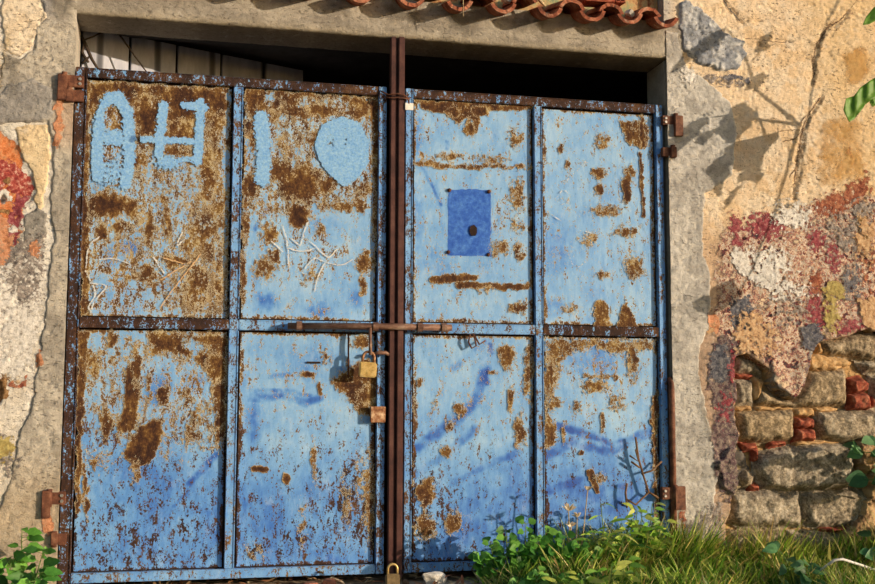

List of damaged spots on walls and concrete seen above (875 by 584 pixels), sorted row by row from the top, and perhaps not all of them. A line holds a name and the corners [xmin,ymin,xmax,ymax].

peeling [0,434,22,478]
peeling [0,124,51,402]
corrosion [74,328,229,523]
corrosion [80,80,378,319]
corrosion [300,333,376,419]
corrosion [414,99,533,137]
corrosion [429,272,532,316]
corrosion [488,298,657,457]
corrosion [578,113,651,248]
spalling [680,65,751,89]
spalling [704,190,875,553]
crack [774,0,857,200]